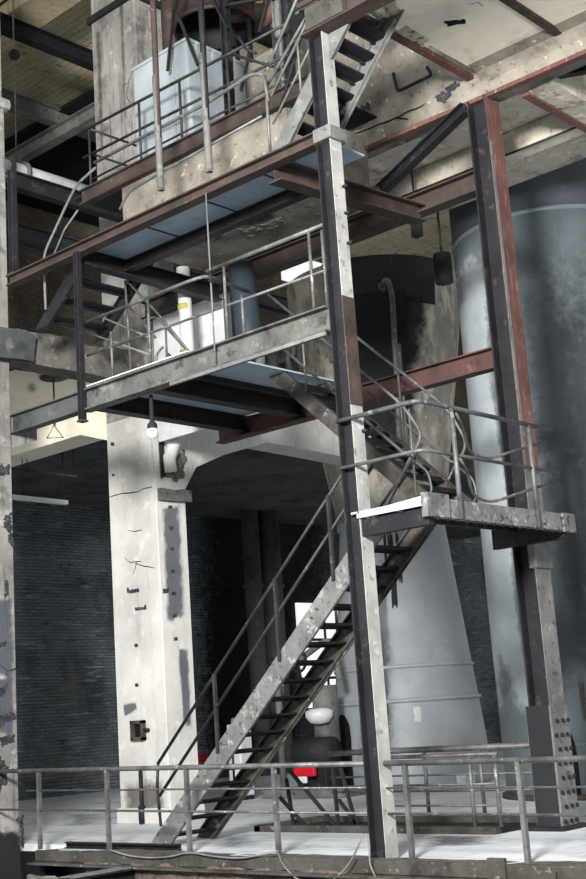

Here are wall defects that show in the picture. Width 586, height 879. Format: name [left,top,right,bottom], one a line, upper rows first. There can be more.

crack [355,104,424,134]
spalling [166,449,187,483]
spalling [0,712,16,792]